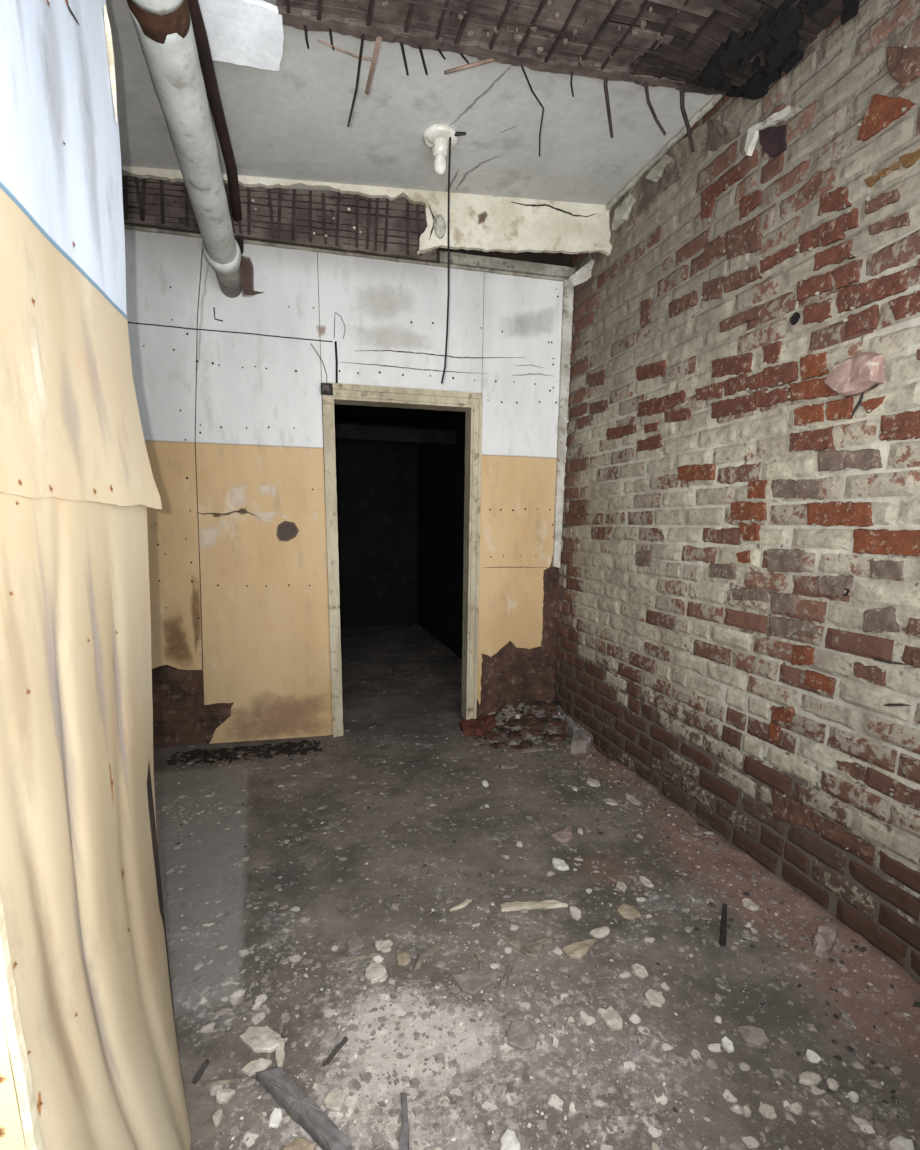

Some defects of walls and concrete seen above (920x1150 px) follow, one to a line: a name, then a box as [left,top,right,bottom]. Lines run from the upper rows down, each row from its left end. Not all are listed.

flaking render [276,0,860,157]
peeling [857,46,920,141]
spalling [701,105,802,219]
flaking render [122,175,200,233]
flaking render [224,183,440,263]
crack [512,202,598,217]
peeling [666,149,920,337]
peeling [197,488,299,546]
peeling [606,341,920,694]
peeling [769,706,795,742]
peeling [837,760,865,780]
peeling [890,785,920,810]